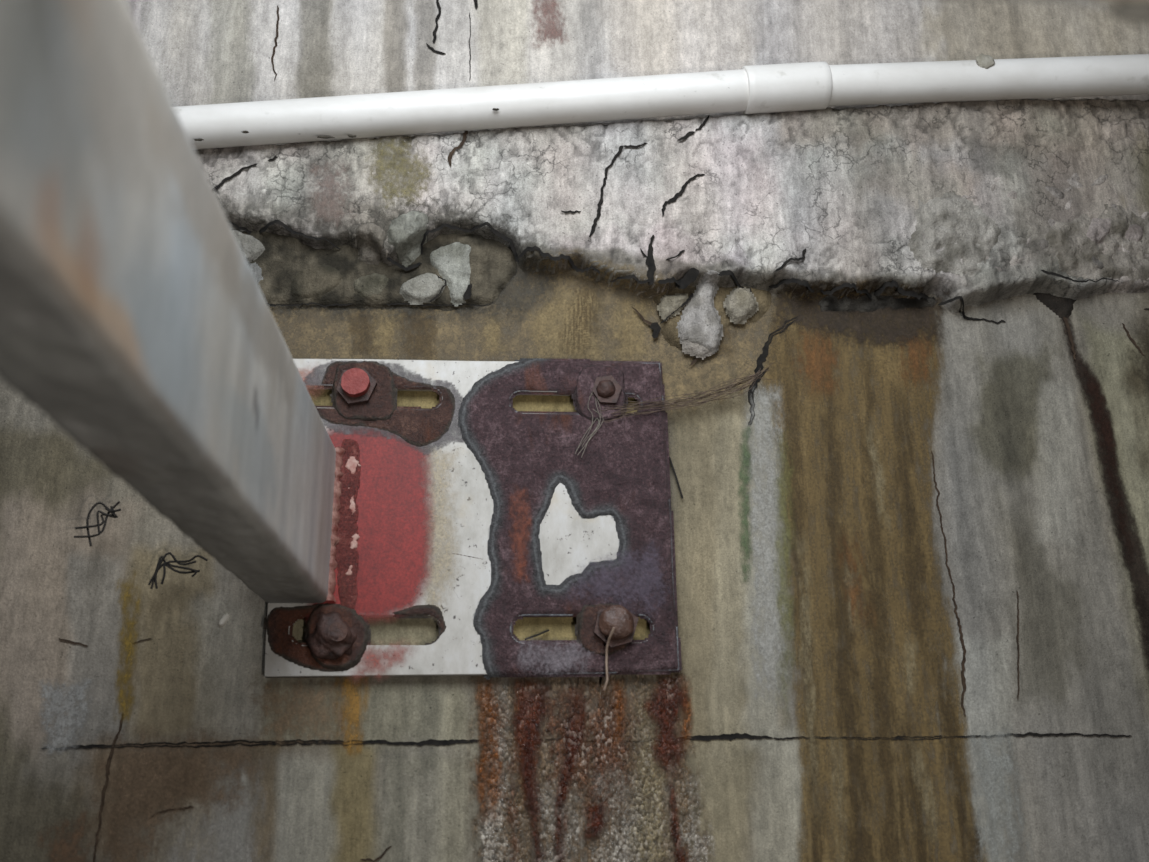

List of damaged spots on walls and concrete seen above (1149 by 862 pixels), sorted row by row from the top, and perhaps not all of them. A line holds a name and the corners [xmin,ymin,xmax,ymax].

crack [213,156,277,191]
spalling [228,210,519,311]
crack [448,131,468,166]
crack [561,143,648,237]
crack [518,174,705,285]
crack [677,115,709,141]
spalling [632,268,771,366]
crack [769,249,1005,324]
damp [1061,316,1149,669]
rust [263,603,366,752]
rust [304,358,713,862]
crack [41,452,1131,862]